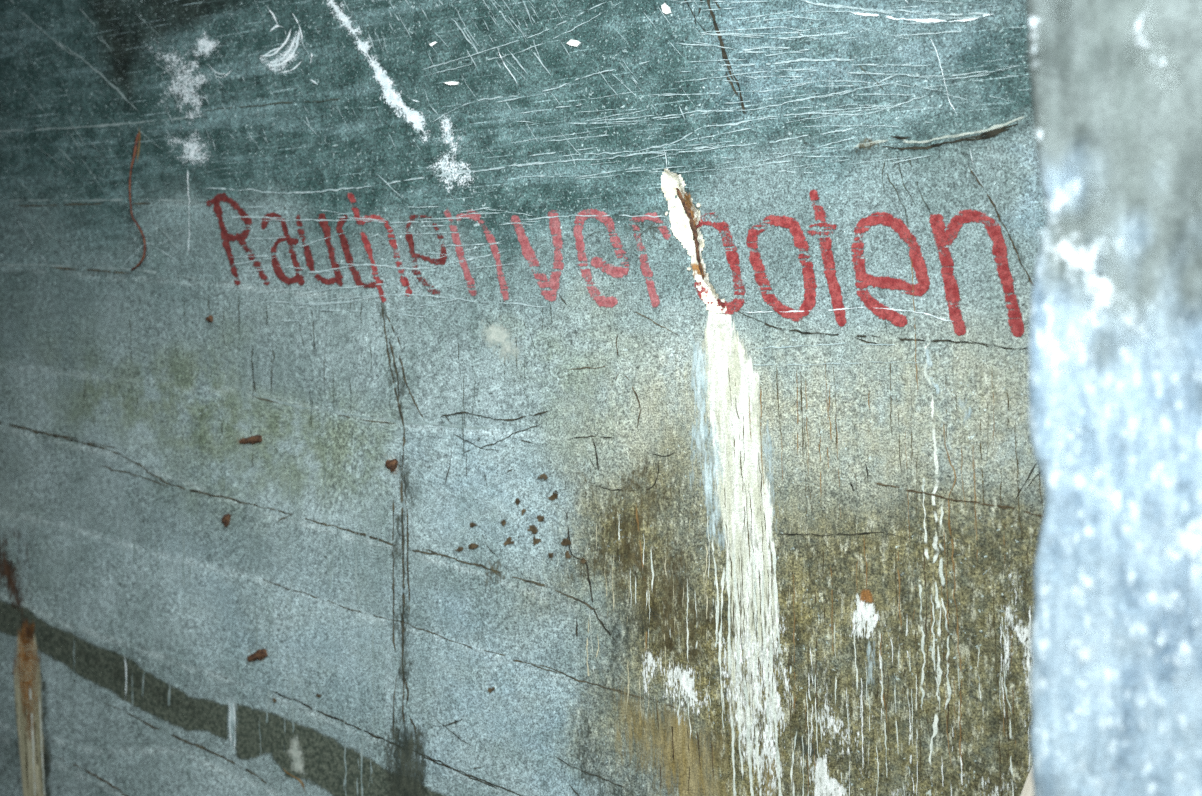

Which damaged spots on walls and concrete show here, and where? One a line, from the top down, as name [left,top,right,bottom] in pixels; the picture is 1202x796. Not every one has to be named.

crack [685,0,745,119]
crack [439,410,550,485]
crack [560,335,676,643]
water stain [568,306,1017,796]
rust [0,552,52,796]
water stain [0,600,444,796]
crack [426,709,487,770]
crack [557,757,626,796]
water stain [998,566,1032,770]